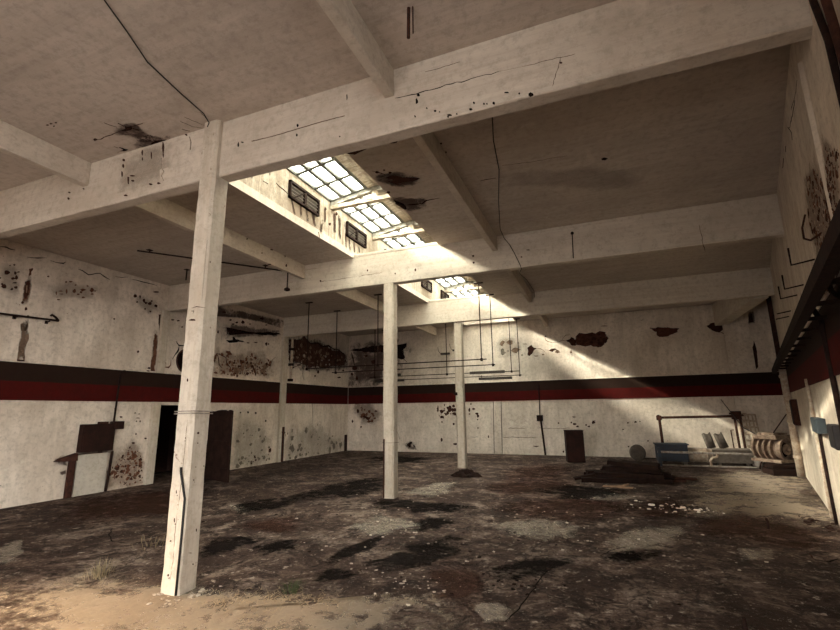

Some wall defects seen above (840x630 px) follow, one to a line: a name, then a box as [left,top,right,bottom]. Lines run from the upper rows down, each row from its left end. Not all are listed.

crack [397,54,574,98]
peeling [806,144,839,253]
rust [147,314,161,372]
peeling [214,325,280,377]
spalling [288,336,384,387]
spalling [397,340,410,366]
spalling [500,325,609,357]
spalling [651,327,679,337]